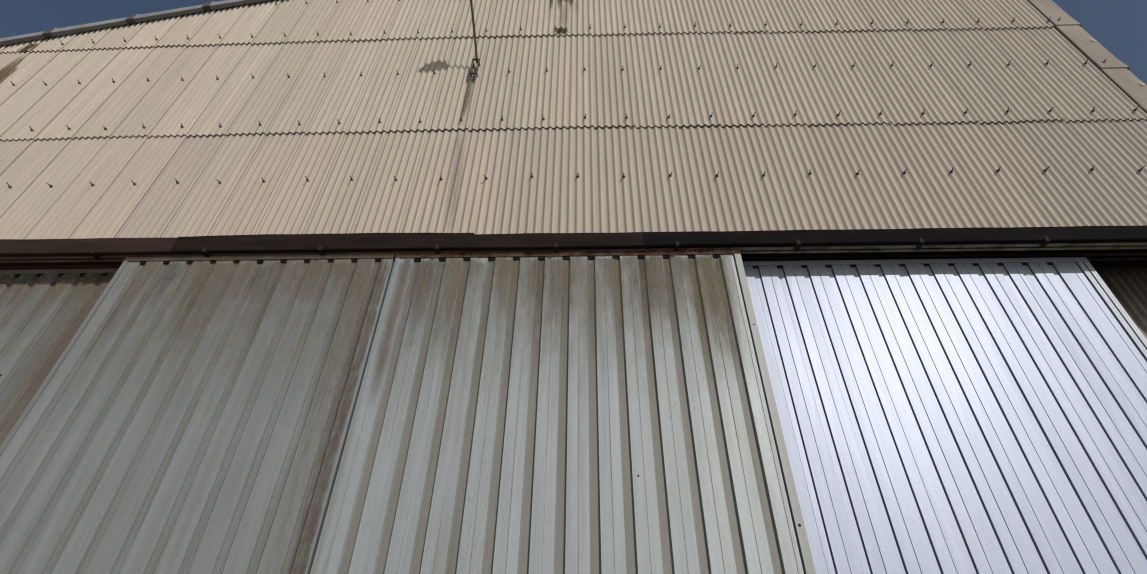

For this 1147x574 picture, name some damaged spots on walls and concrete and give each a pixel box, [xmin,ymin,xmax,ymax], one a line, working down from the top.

damp [0,43,39,84]
damp [0,274,109,446]
damp [290,258,410,574]